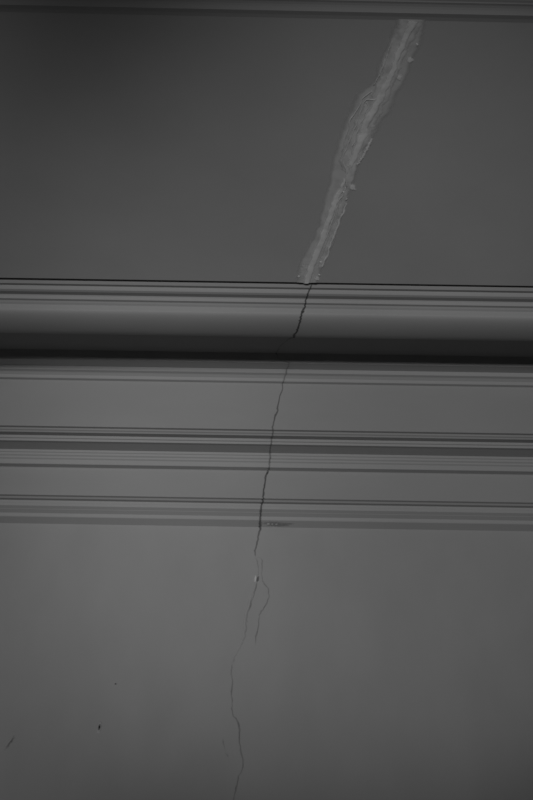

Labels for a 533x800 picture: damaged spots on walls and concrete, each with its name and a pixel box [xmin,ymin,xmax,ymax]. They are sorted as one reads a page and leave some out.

leakage [348,22,418,167]
leakage [304,179,347,284]
crack [293,283,317,338]